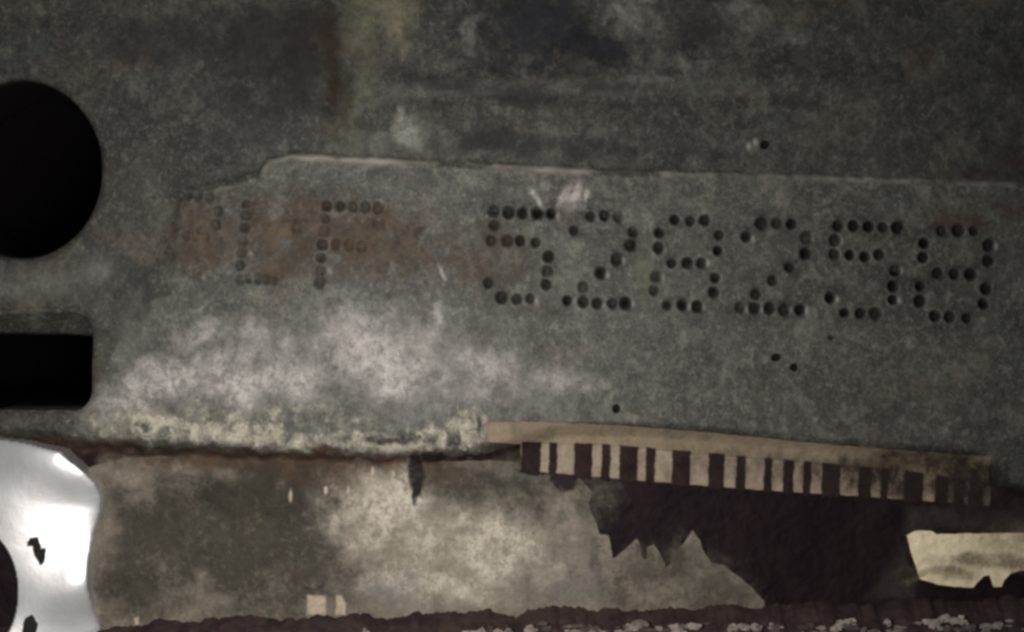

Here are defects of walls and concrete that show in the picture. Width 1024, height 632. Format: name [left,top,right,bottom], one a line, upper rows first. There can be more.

water stain [100,307,514,431]